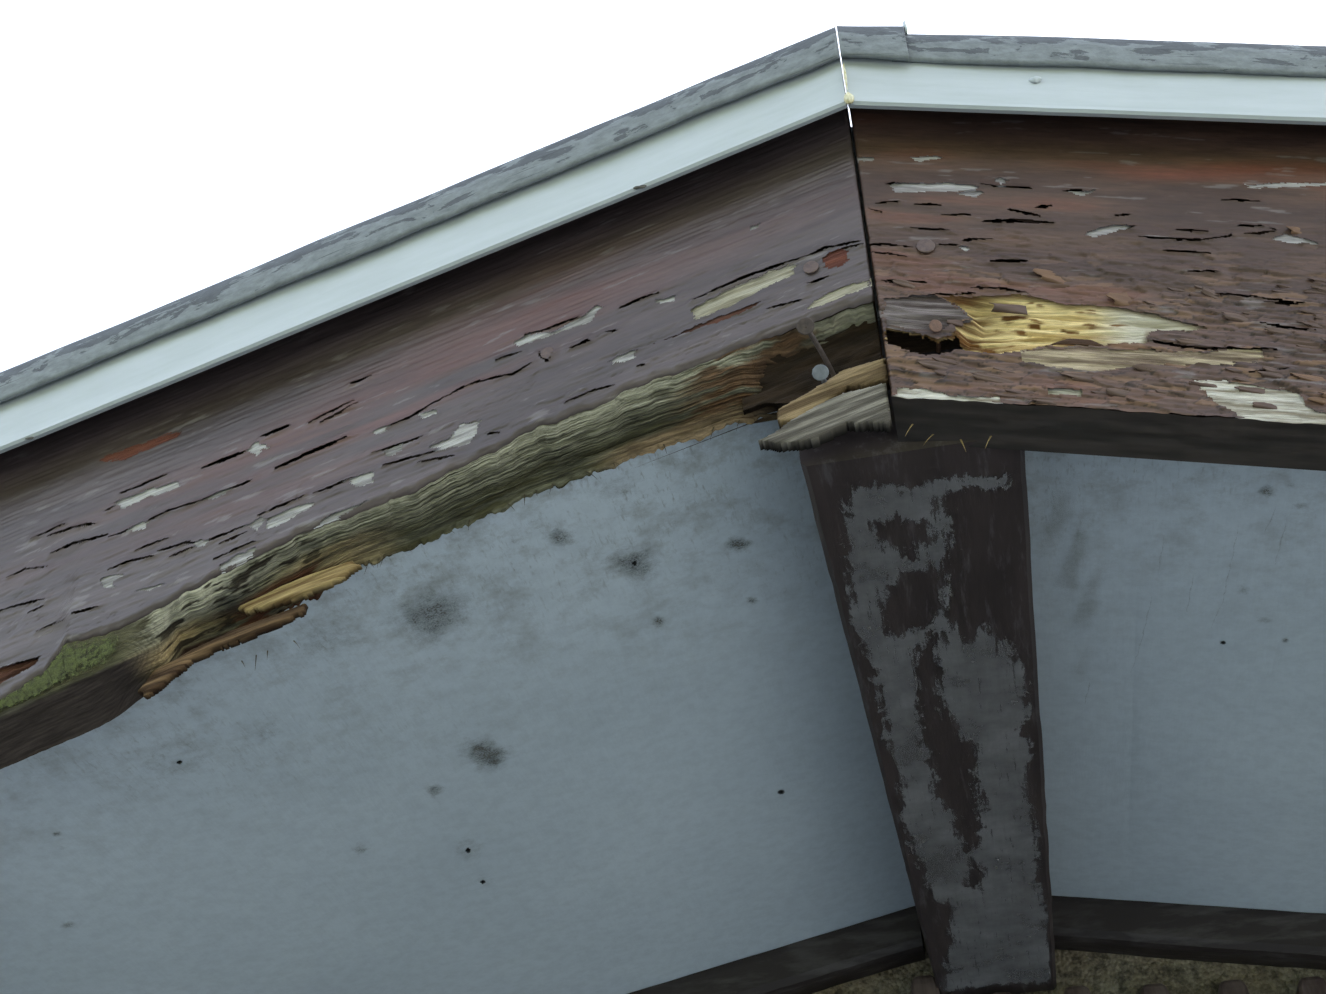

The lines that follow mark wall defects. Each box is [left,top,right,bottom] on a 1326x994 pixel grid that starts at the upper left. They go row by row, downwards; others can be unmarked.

peeling [890,177,1009,198]
peeling [1272,226,1318,244]
peeling [653,264,798,344]
peeling [807,278,872,309]
peeling [514,305,603,347]
peeling [1106,285,1326,425]
peeling [893,367,1170,406]
peeling [429,419,482,452]
peeling [111,481,180,509]
peeling [243,502,314,531]
peeling [0,659,38,684]
peeling [841,473,1051,992]